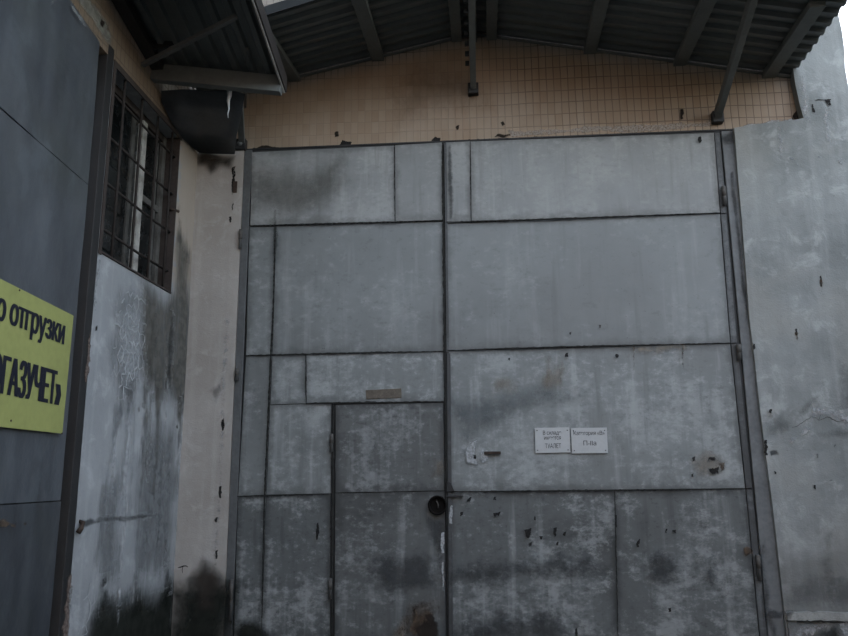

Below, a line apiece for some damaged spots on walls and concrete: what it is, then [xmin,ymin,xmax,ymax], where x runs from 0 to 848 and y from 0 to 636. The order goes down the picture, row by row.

water stain [102,234,189,575]
water stain [88,564,238,636]
corrosion [399,603,438,636]